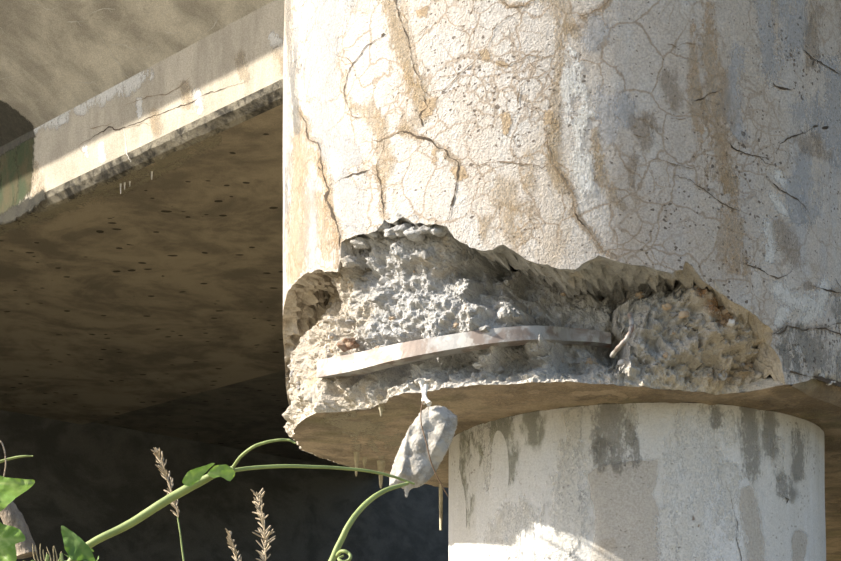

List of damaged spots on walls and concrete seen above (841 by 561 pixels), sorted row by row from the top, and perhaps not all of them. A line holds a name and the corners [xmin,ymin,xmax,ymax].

water stain [0,70,221,236]
crack [79,77,242,160]
water stain [268,27,298,213]
crack [296,0,612,266]
water stain [560,44,633,194]
crack [659,159,744,213]
crack [722,125,829,214]
rust [337,337,360,352]
spalling [282,213,841,463]
water stain [771,278,831,328]
crack [772,323,841,335]
water stain [654,407,741,561]